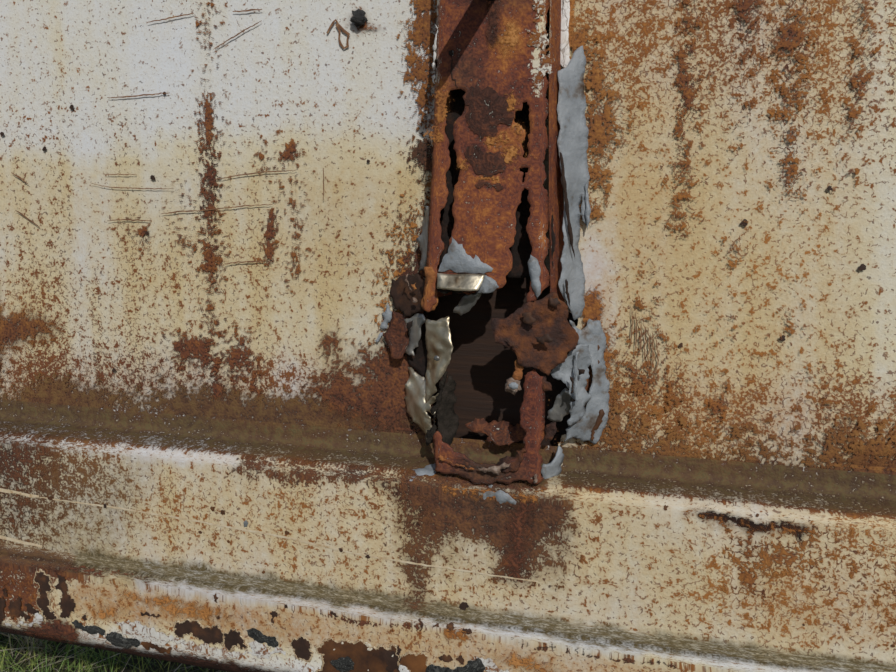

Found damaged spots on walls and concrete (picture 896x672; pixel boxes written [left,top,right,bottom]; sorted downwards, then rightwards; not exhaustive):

corrosion [568,0,642,232]
corrosion [725,0,882,228]
corrosion [153,0,266,402]
corrosion [296,0,532,435]
peeling [528,255,541,299]
peeling [541,446,564,479]
peeling [78,633,107,644]
peeling [0,563,191,627]
peeling [114,611,510,672]
corrosion [227,448,582,612]
peeling [566,644,676,668]
corrosion [720,518,896,631]